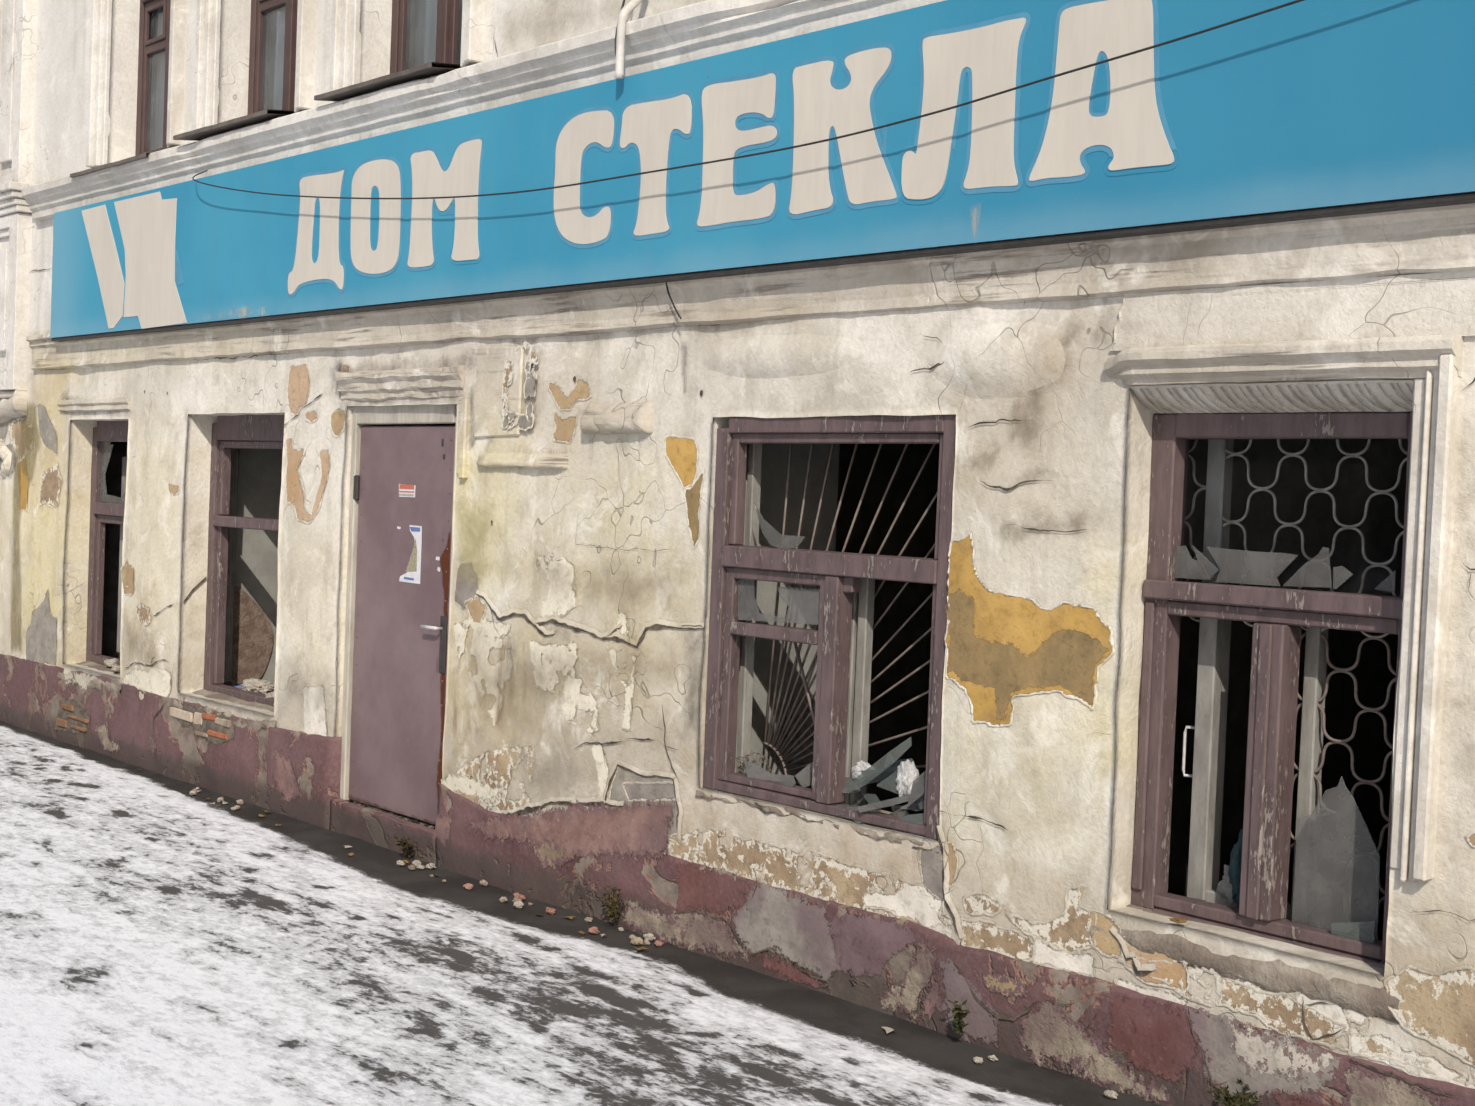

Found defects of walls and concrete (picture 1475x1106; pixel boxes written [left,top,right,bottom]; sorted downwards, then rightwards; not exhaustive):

flaking render [0,403,63,511]
flaking render [286,363,346,524]
flaking render [502,342,592,444]
flaking render [664,434,704,549]
crack [911,336,944,372]
crack [968,419,1022,428]
crack [981,480,1087,532]
flaking render [121,560,152,626]
crack [476,590,704,648]
flaking render [25,588,121,754]
peeling [435,532,1475,1106]